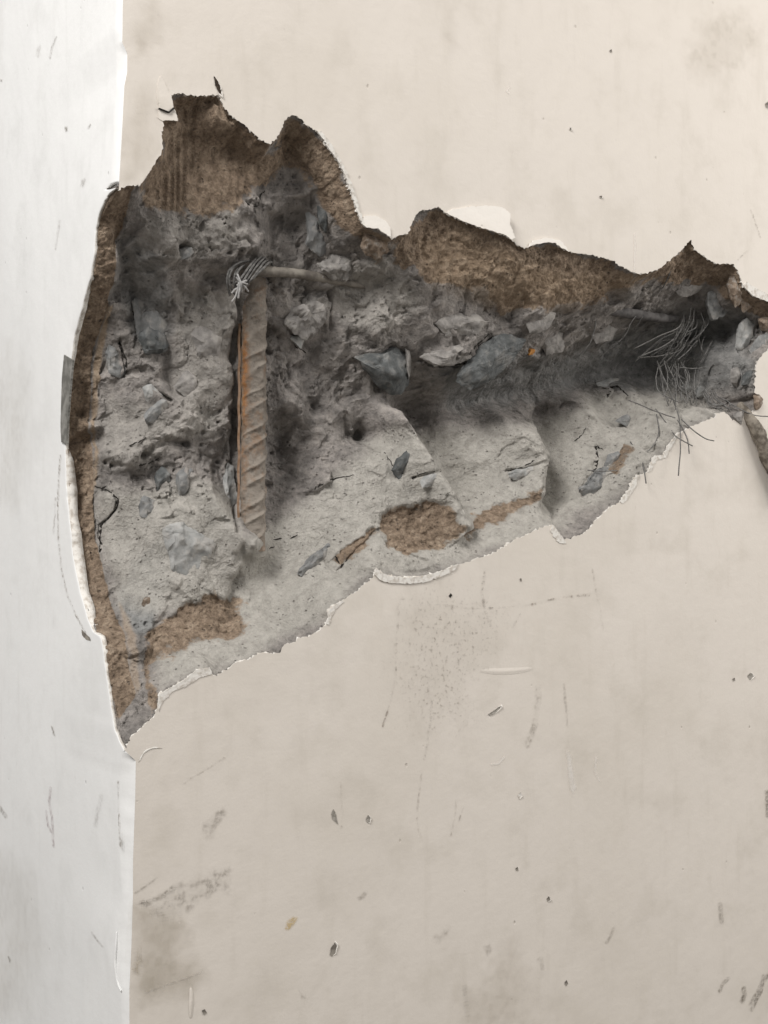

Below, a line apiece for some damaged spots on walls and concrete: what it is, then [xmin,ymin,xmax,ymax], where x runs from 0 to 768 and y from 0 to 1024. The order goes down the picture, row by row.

spalling [60,75,768,748]